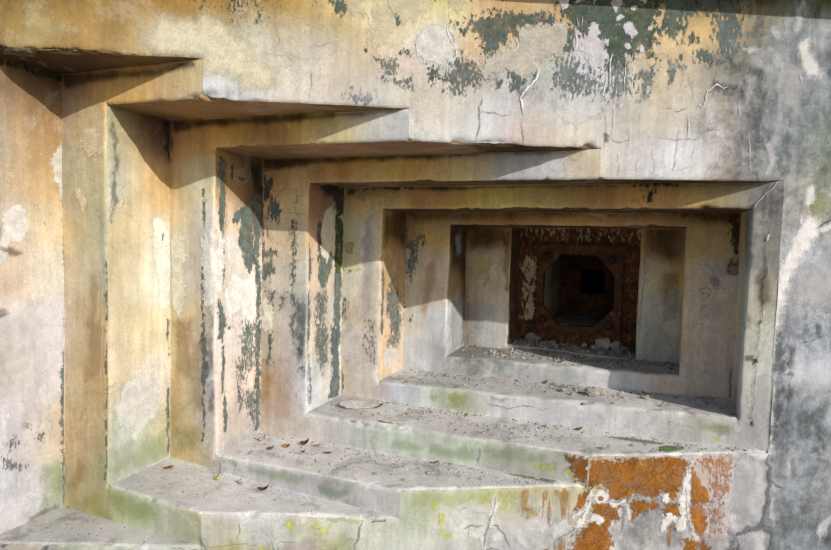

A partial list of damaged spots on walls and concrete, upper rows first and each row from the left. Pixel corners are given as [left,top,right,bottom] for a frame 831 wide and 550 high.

crack [476,39,548,142]
flaking render [577,22,609,94]
flaking render [611,0,647,52]
leakage [765,142,775,176]
crack [750,181,779,426]
leakage [773,185,831,372]
leakage [745,383,785,461]
crack [460,493,510,550]
crack [558,489,646,541]
corrosion [518,453,739,550]
crack [735,454,783,550]
leakage [817,515,831,538]